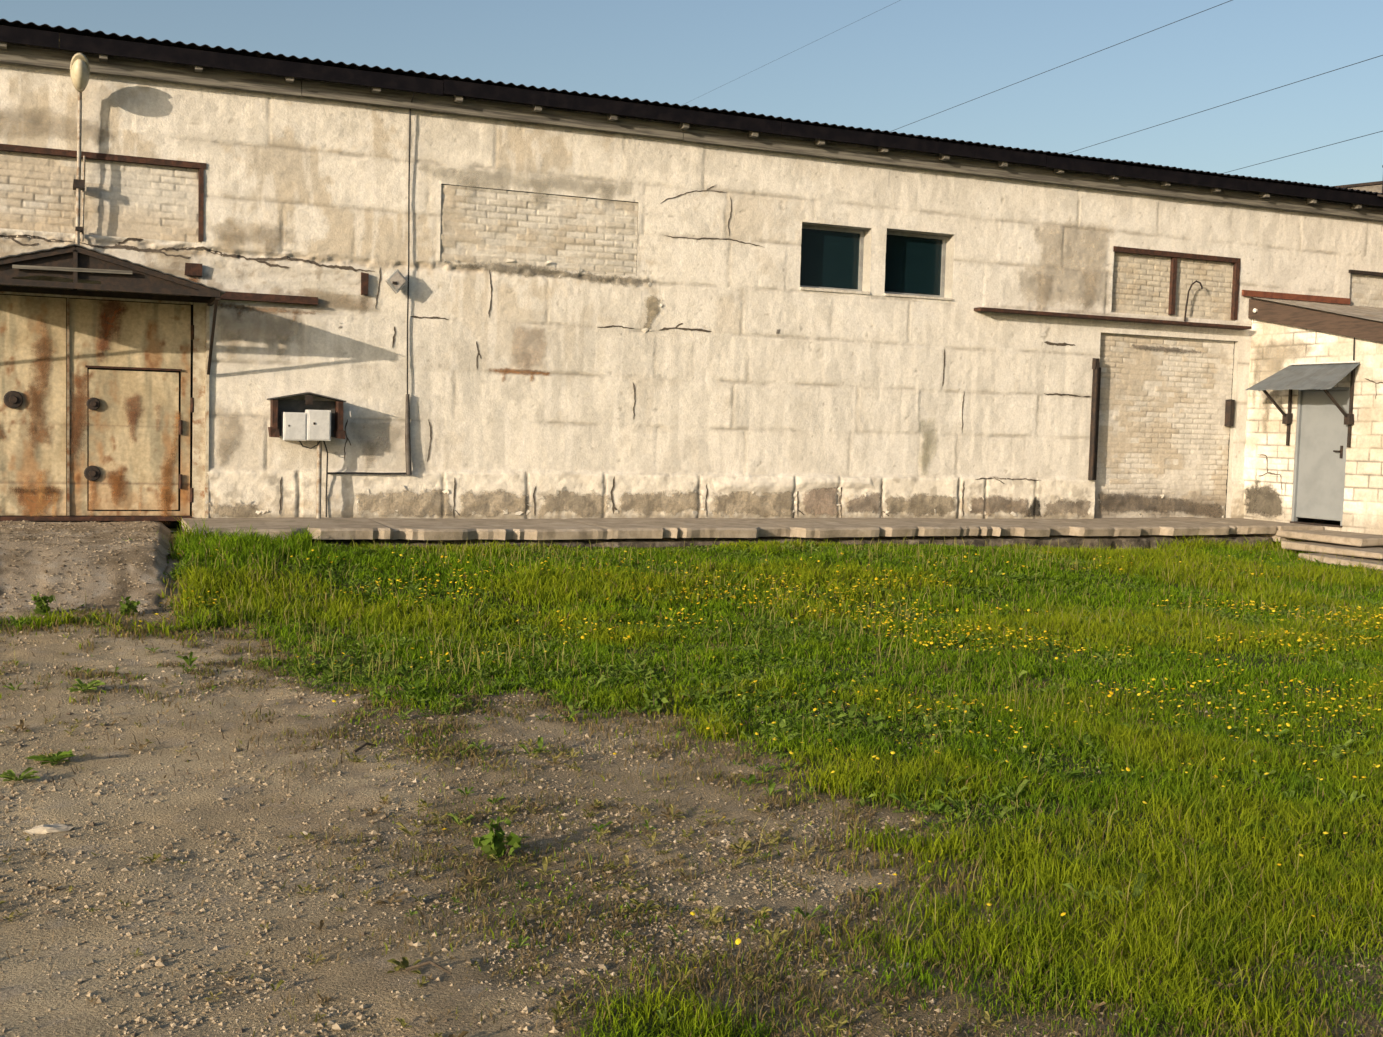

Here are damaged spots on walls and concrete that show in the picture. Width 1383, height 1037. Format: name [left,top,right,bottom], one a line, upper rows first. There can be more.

crack [660,185,762,247]
corrosion [99,300,125,350]
crack [0,235,449,348]
crack [476,269,492,368]
corrosion [29,323,50,455]
corrosion [126,395,141,439]
corrosion [10,471,59,516]
corrosion [89,470,142,513]
corrosion [157,413,180,516]
damp [1025,498,1040,517]